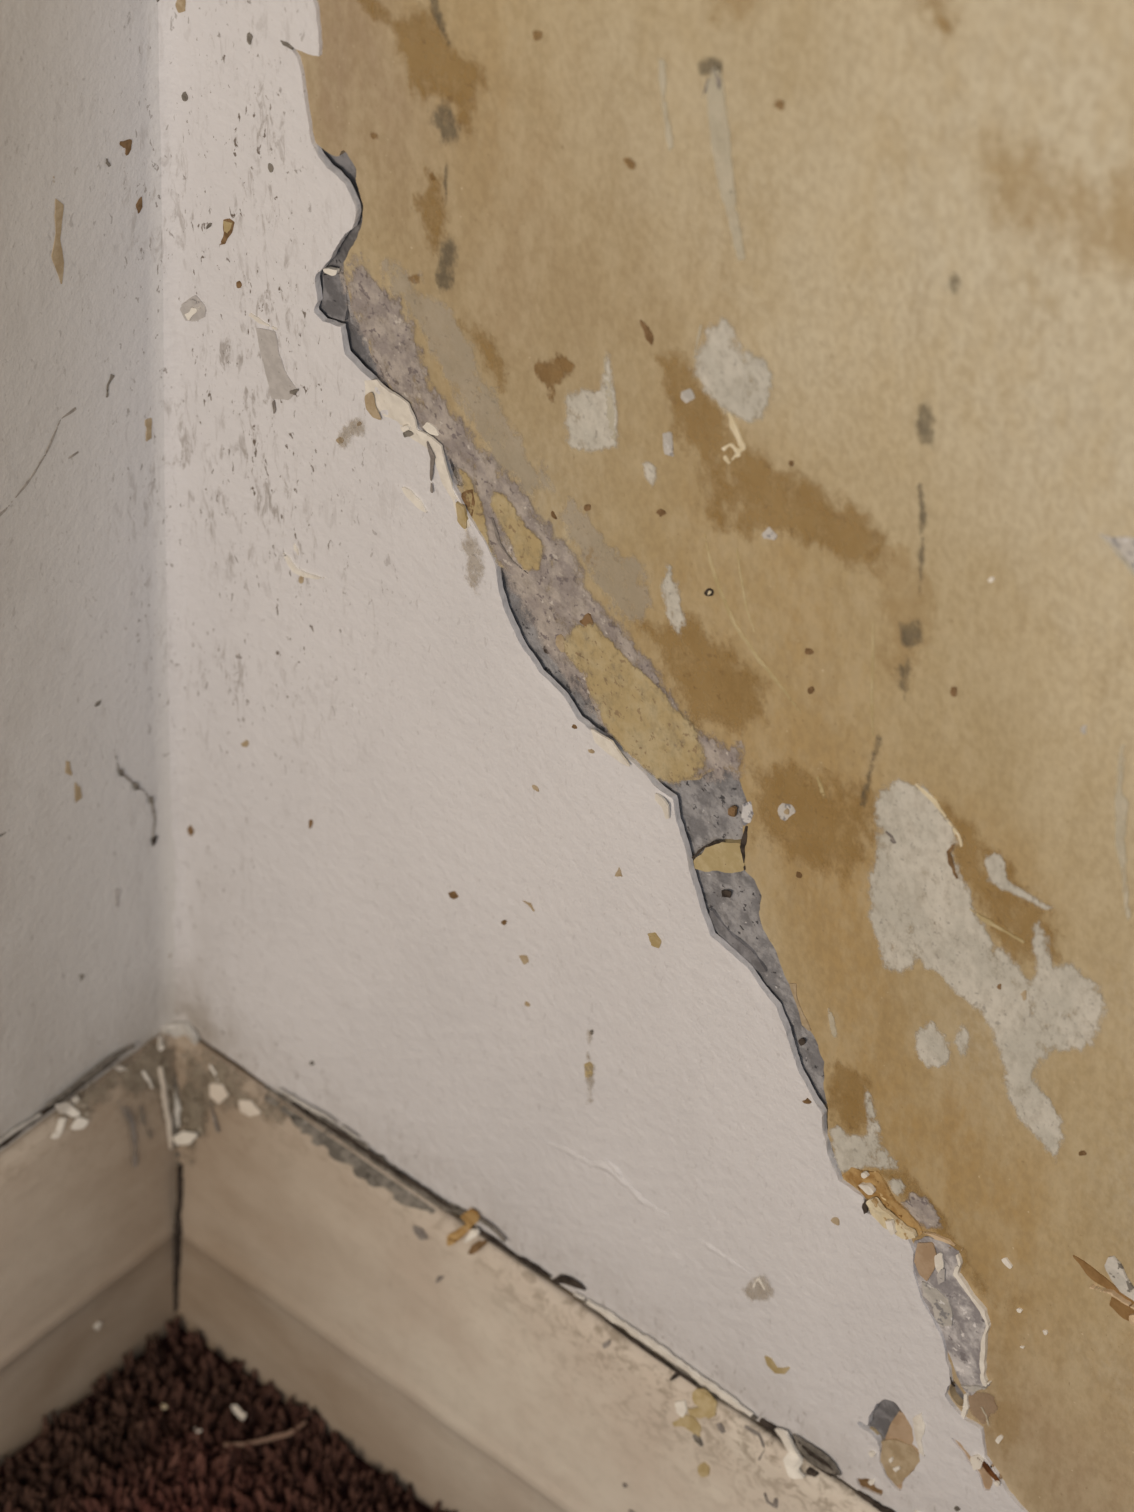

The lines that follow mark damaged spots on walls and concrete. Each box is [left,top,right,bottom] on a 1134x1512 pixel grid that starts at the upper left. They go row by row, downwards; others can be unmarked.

water stain [361,0,484,138]
peeling [206,218,235,245]
peeling [319,149,475,532]
flaking render [564,358,617,451]
flaking render [681,318,772,464]
water stain [660,358,884,563]
peeling [501,567,630,767]
water stain [760,765,877,866]
water stain [945,808,1053,955]
peeling [655,769,898,1172]
flaking render [868,780,1105,1156]
peeling [173,1131,197,1145]